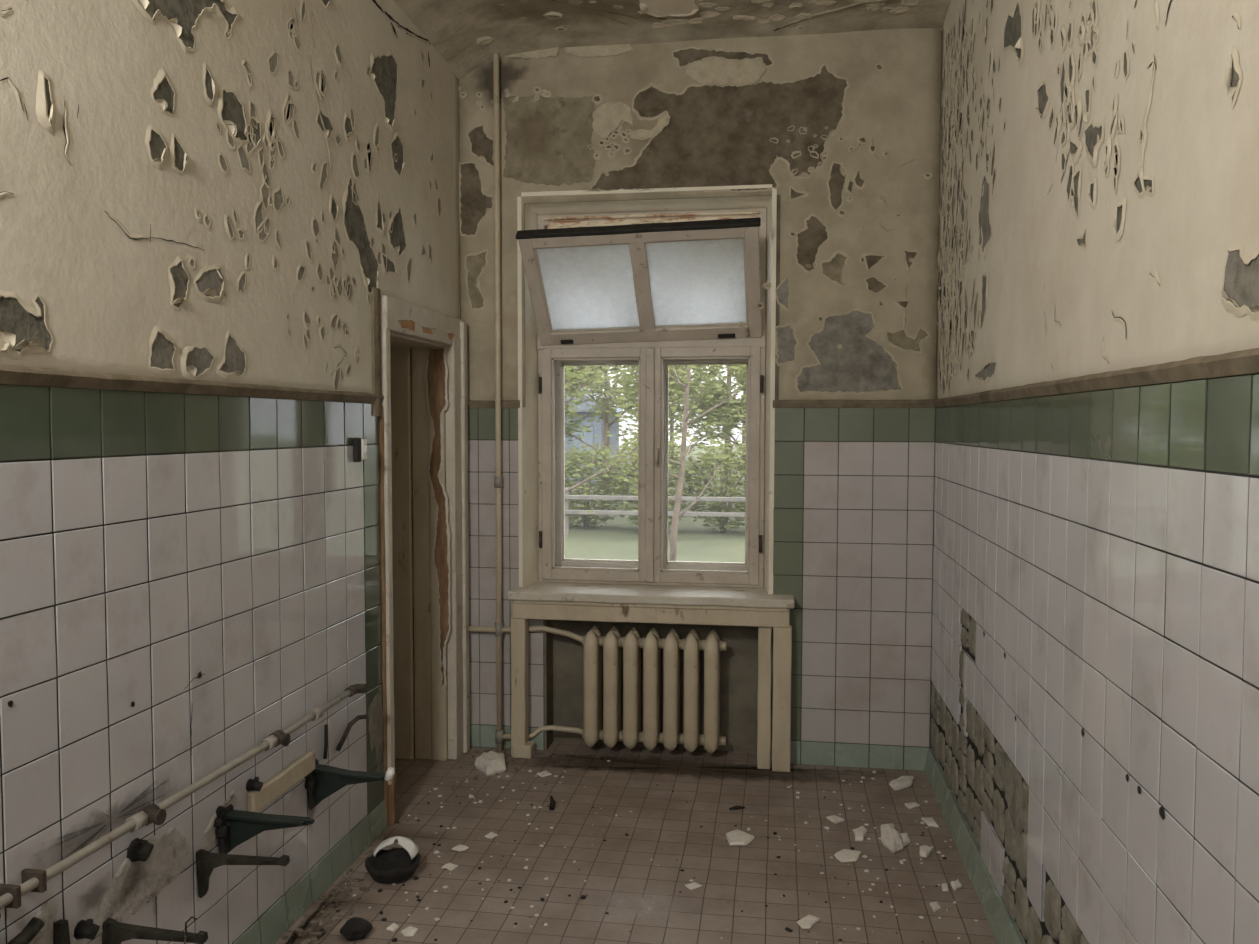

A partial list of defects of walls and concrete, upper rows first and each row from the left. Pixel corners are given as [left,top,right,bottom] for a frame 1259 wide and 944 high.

peeling [286,0,333,52]
peeling [542,0,597,31]
peeling [612,0,921,30]
peeling [132,0,300,311]
peeling [459,44,890,238]
peeling [285,42,432,391]
peeling [756,0,1154,398]
peeling [1221,244,1259,321]
peeling [0,289,55,359]
peeling [148,326,247,381]
peeling [930,608,1089,944]